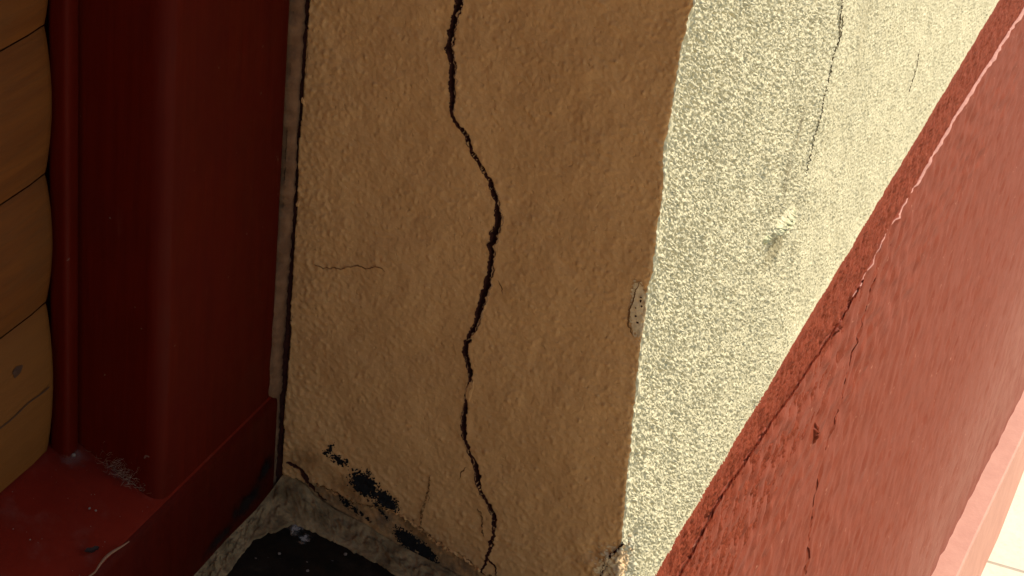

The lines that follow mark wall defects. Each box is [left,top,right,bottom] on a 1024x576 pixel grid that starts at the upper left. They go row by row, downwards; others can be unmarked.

crack [444,0,504,575]
flaking render [627,278,648,342]